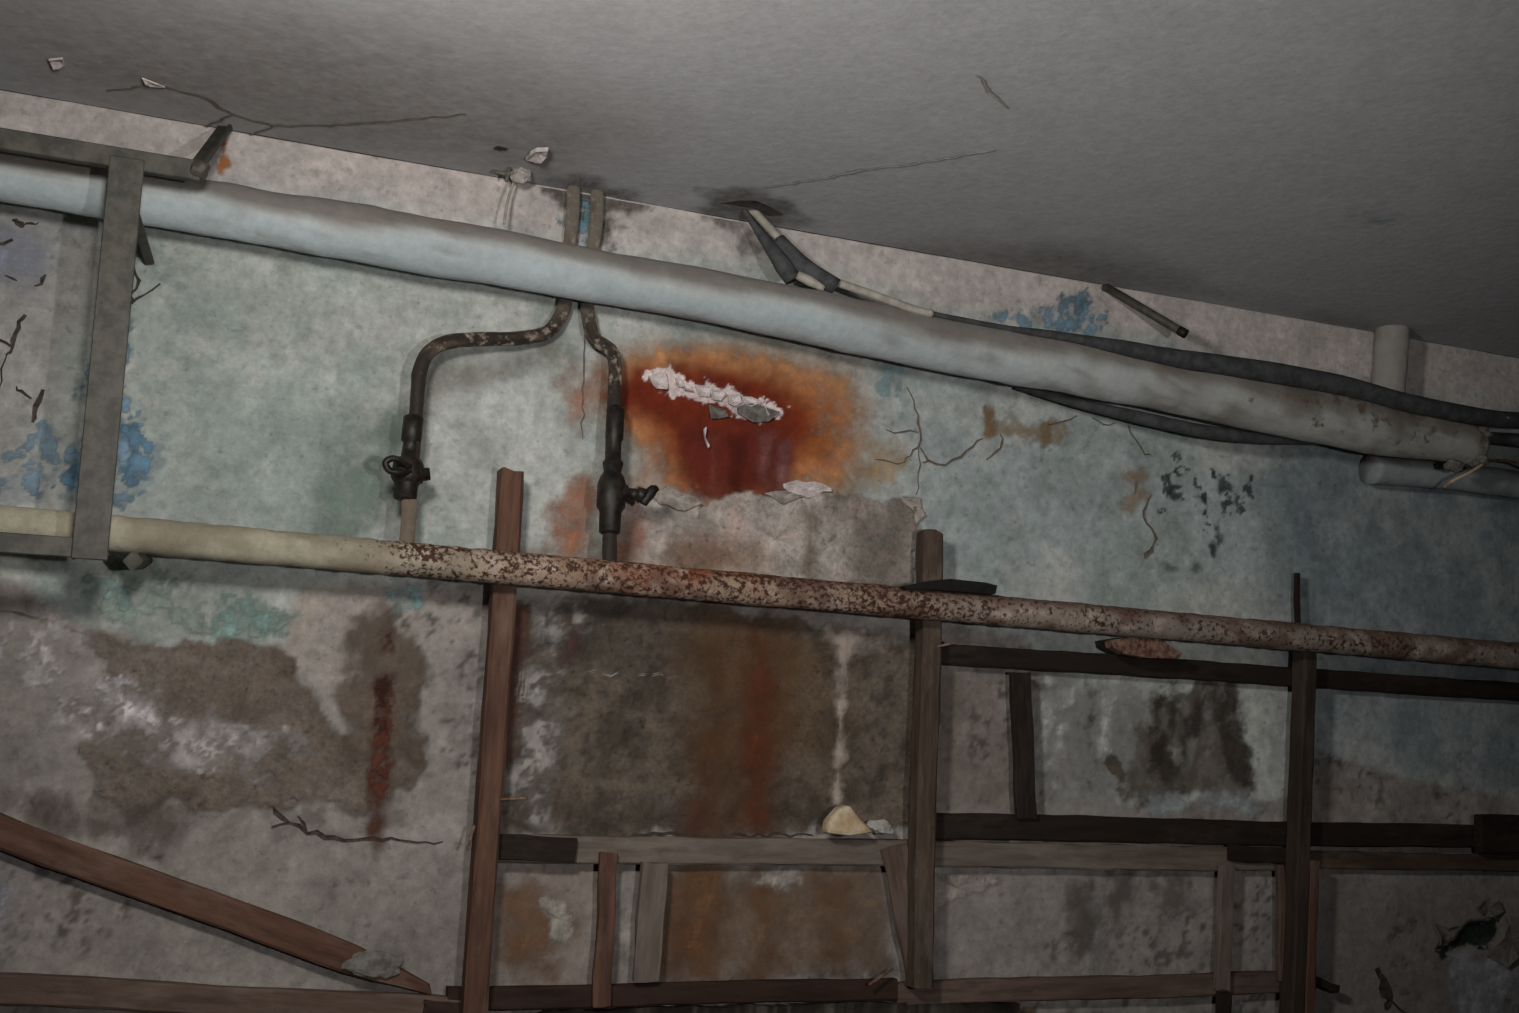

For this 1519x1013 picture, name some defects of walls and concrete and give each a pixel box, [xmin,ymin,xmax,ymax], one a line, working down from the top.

crack [0,218,46,423]
peeling [993,289,1108,336]
peeling [0,420,82,499]
peeling [113,397,154,509]
rust [573,345,865,507]
crack [874,387,1004,494]
rust [983,406,1066,447]
water stain [0,608,288,774]
crack [271,806,443,844]
rust [367,676,393,847]
water stain [506,602,586,831]
water stain [1089,679,1273,818]